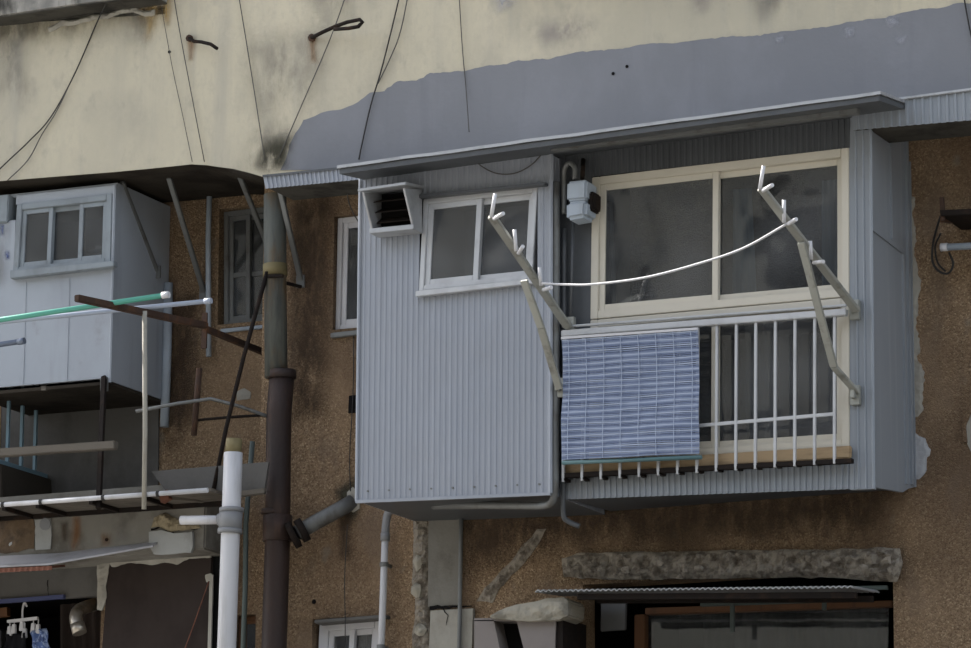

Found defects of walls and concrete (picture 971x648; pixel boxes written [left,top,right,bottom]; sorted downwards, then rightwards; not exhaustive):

damp [259,140,287,166]
peeling [911,197,925,417]
spalling [962,407,971,451]
peeling [915,434,931,479]
peeling [0,519,35,554]